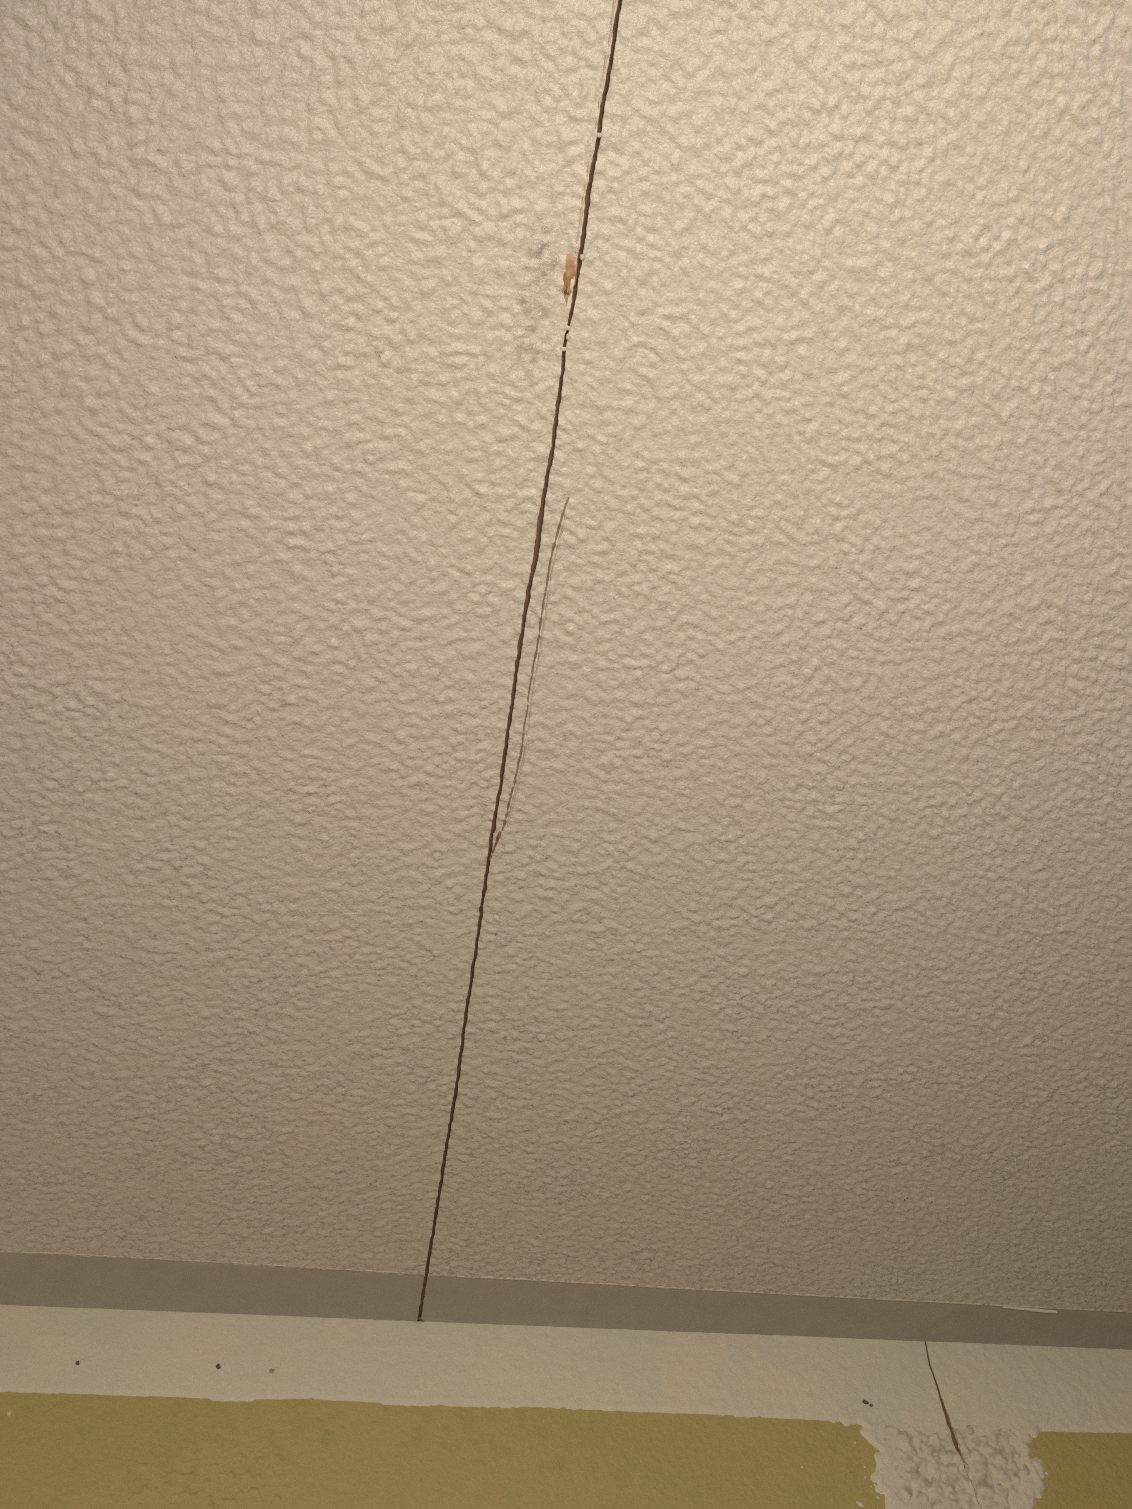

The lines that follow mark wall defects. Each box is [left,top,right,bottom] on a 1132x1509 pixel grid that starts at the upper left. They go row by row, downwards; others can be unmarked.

crack [418,0,622,1322]
crack [925,1344,982,1509]